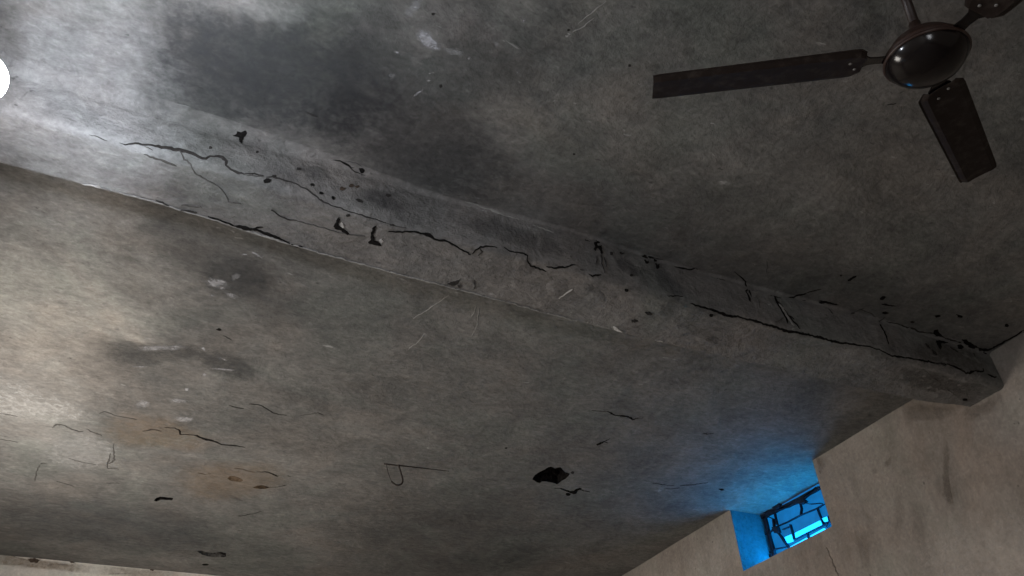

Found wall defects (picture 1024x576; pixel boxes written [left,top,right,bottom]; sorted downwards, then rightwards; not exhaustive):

crack [91,135,607,277]
peeling [82,184,577,321]
crack [669,265,1024,378]
crack [34,411,290,487]
crack [229,404,323,416]
spalling [533,467,589,496]
crack [592,410,642,420]